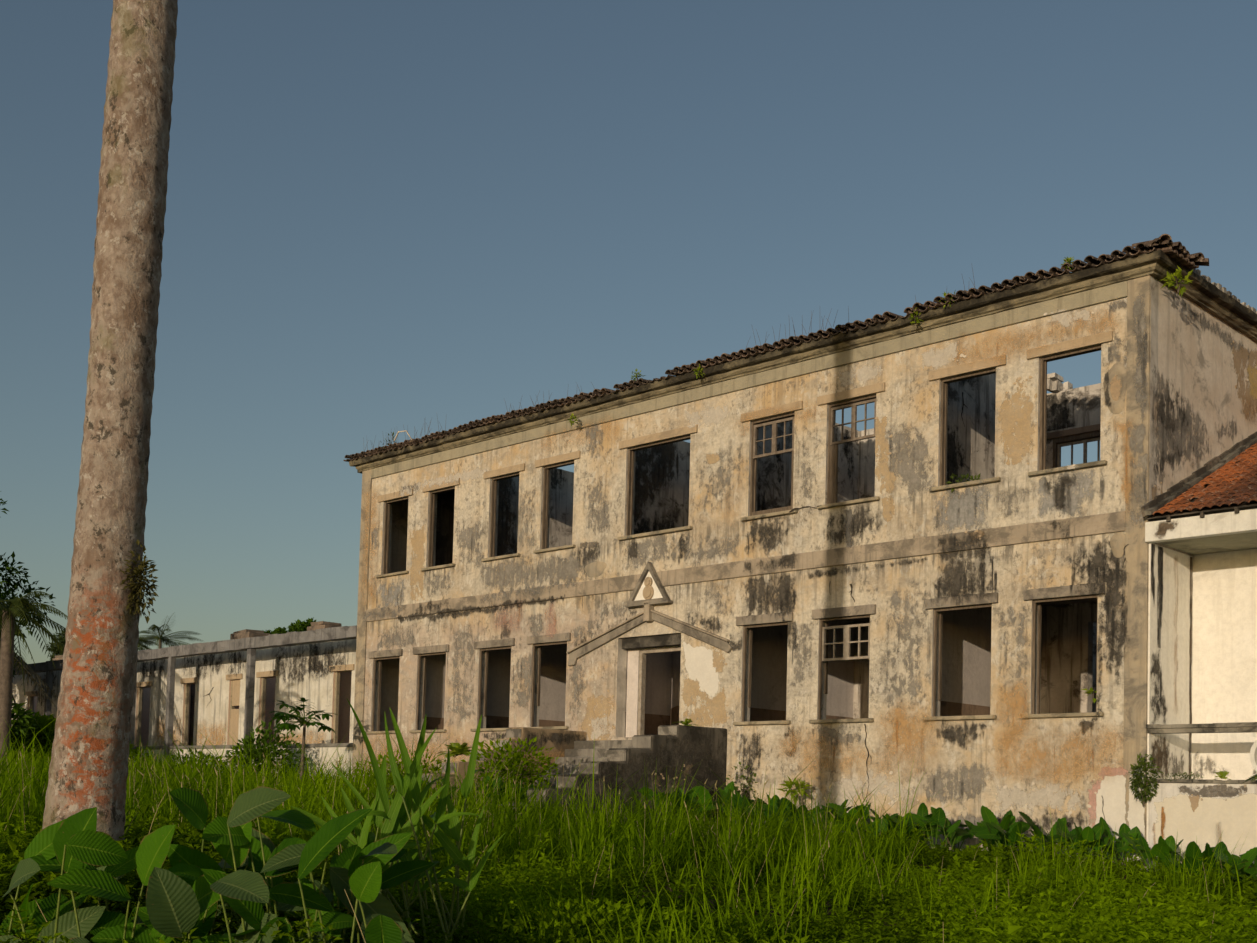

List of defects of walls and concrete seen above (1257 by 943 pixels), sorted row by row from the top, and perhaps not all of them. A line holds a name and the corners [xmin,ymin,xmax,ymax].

peeling [998,376,1037,465]
peeling [1231,341,1257,420]
water stain [273,643,345,682]
water stain [364,479,599,719]
peeling [681,641,730,727]
water stain [625,443,811,685]
water stain [827,507,878,547]
water stain [881,423,1104,701]
water stain [1070,541,1127,735]
water stain [1108,294,1237,778]
water stain [937,721,986,749]
water stain [926,763,989,803]